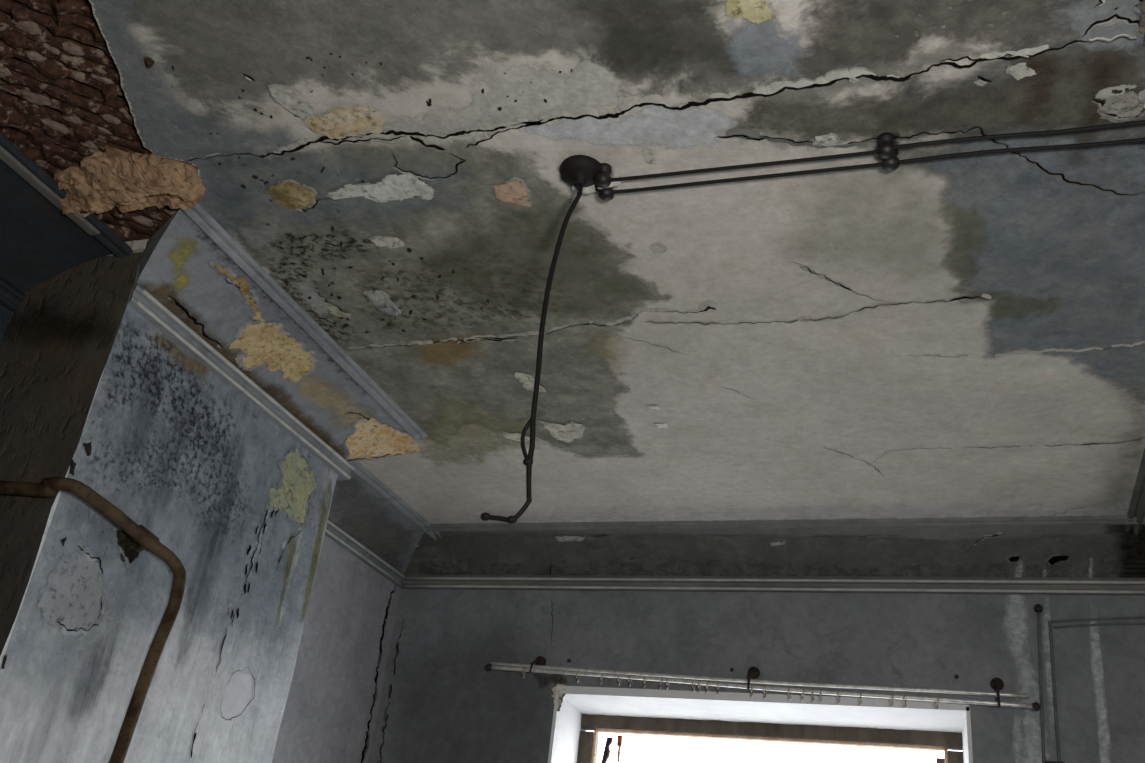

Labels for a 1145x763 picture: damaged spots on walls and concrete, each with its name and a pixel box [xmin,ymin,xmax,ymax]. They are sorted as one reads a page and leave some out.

peeling [207,261,318,384]
peeling [239,157,434,212]
water stain [91,0,1145,460]
crack [187,0,1143,200]
crack [347,262,992,355]
peeling [1056,0,1145,54]
peeling [1095,84,1145,123]
water stain [4,300,1145,666]
crack [191,477,315,758]
crack [361,589,404,763]
water stain [1005,595,1055,763]
water stain [1090,621,1110,763]